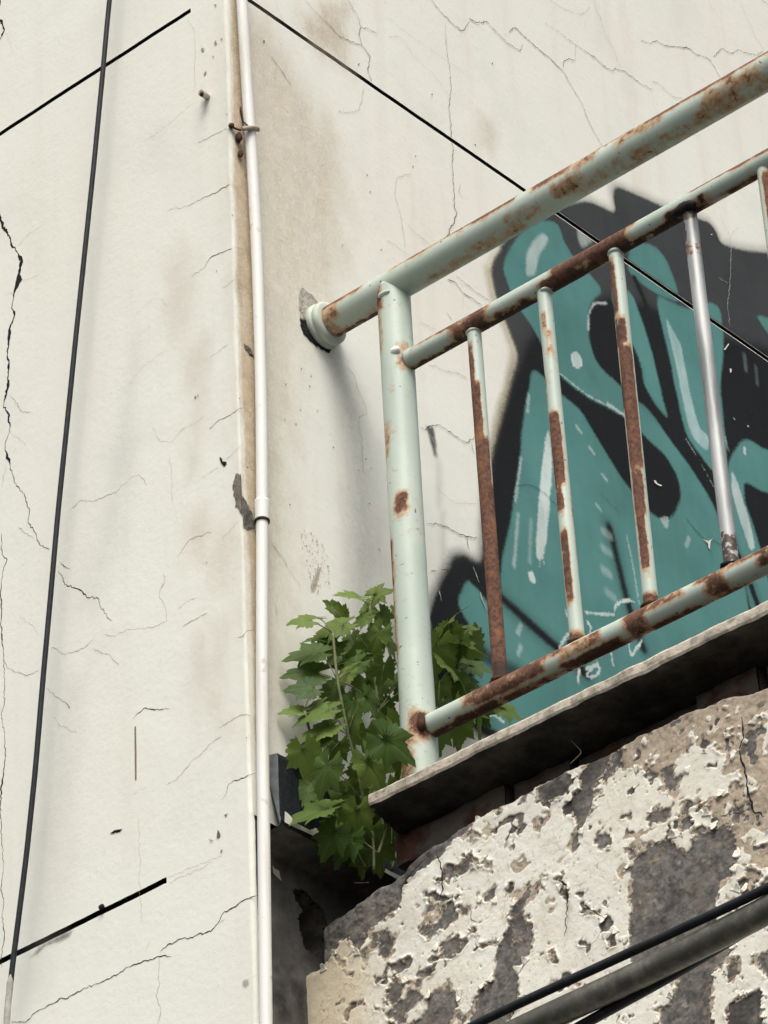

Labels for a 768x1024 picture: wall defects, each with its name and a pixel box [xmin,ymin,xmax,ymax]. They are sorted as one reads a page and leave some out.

crack [644,6,761,75]
crack [307,2,683,255]
spalling [232,467,255,530]
crack [0,215,236,964]
peeling [285,812,319,835]
spalling [520,688,768,963]
crack [722,717,764,817]
crack [14,896,255,1022]
peeling [293,816,481,973]
spalling [382,976,408,1011]
spalling [408,880,538,1024]
spalling [653,943,768,1024]